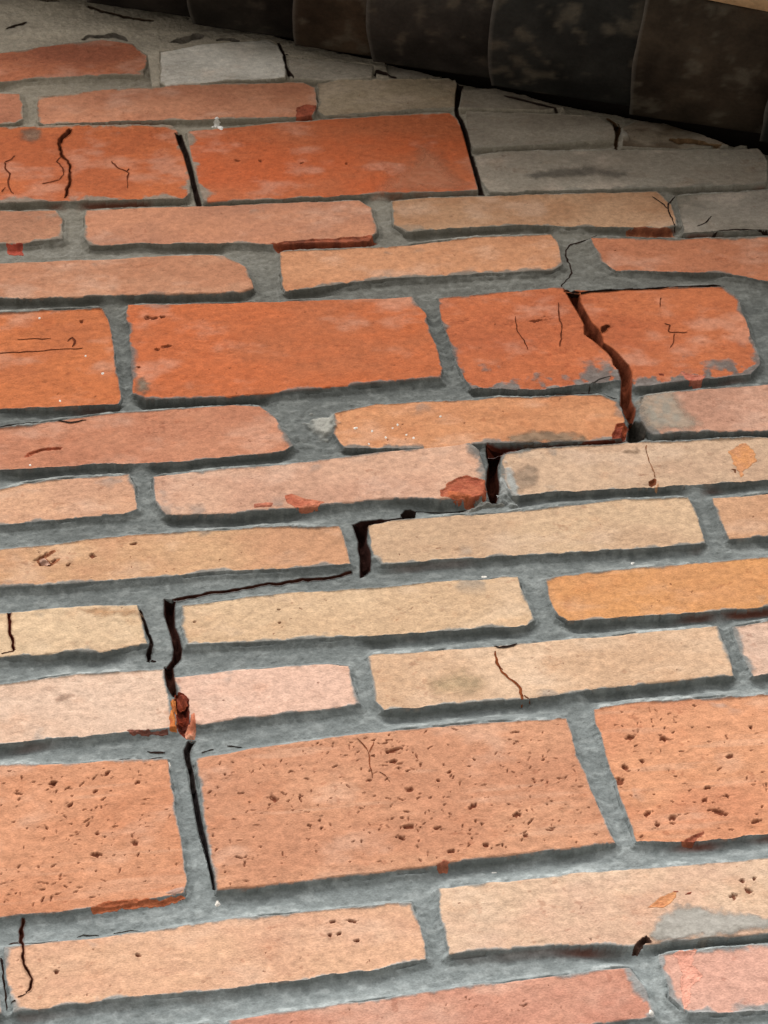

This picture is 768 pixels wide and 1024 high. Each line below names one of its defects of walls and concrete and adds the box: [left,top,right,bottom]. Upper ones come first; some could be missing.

crack [1,156,15,194]
crack [42,128,73,198]
crack [174,132,202,206]
crack [454,83,486,196]
crack [138,235,725,697]
spalling [440,475,519,513]
crack [494,643,530,708]
spalling [127,692,196,740]
crack [358,739,389,780]
crack [117,741,241,890]
crack [0,917,52,1010]
spalling [632,936,653,956]